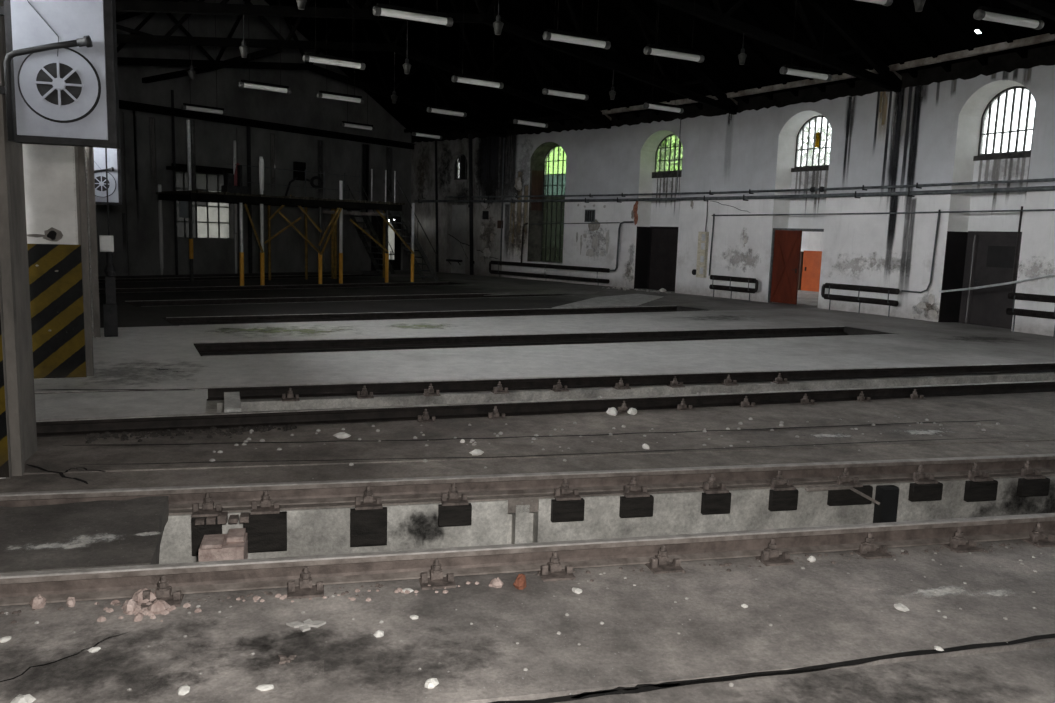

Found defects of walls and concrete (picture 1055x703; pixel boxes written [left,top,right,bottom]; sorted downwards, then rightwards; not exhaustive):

damp [418,135,526,204]
damp [795,170,828,207]
damp [838,79,957,285]